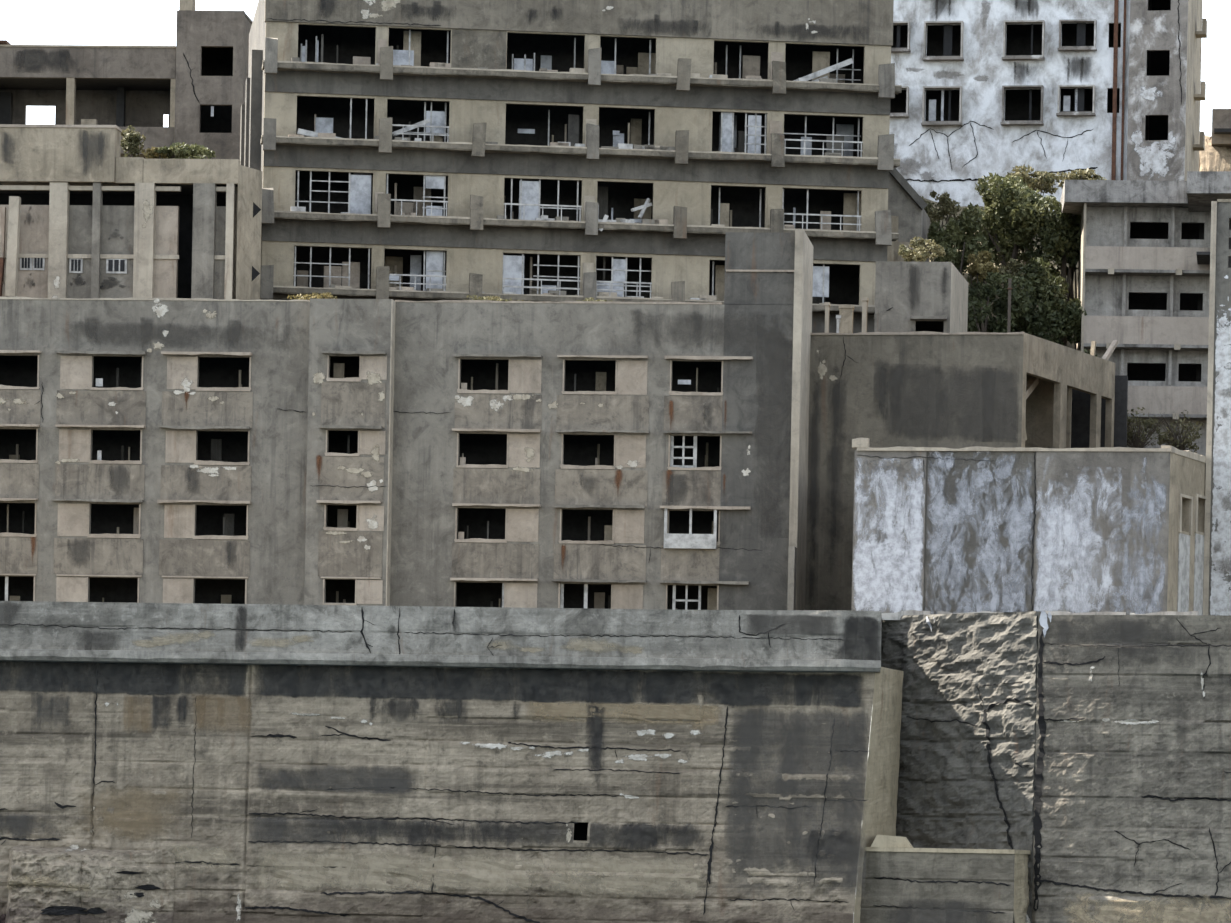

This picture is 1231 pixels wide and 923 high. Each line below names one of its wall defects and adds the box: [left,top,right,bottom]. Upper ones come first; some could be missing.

crack [905,121,1098,182]
spalling [337,445,383,492]
peeling [1210,297,1231,615]
water stain [0,365,1178,895]
crack [175,455,1231,923]